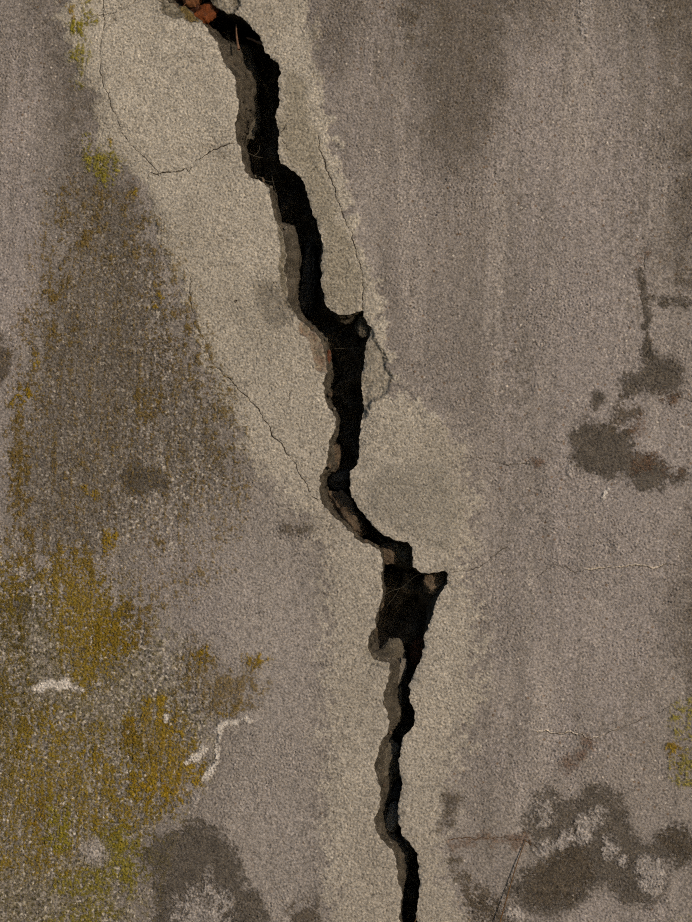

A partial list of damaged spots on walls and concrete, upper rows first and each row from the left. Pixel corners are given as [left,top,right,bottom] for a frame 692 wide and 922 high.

leakage [0,334,13,383]
leakage [567,267,691,500]
leakage [120,458,170,497]
crack [87,0,509,922]
leakage [31,677,85,693]
leakage [135,716,271,922]
leakage [437,792,463,832]
leakage [78,836,108,868]
leakage [448,783,692,922]
leakage [285,895,320,922]